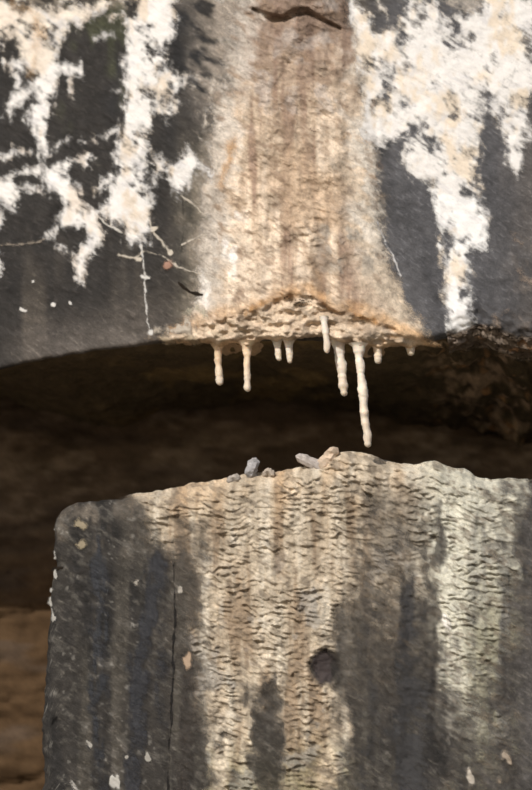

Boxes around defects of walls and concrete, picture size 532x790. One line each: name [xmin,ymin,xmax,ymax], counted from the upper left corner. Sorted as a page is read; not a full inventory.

water stain [0,0,532,358]
spalling [447,325,532,361]
crack [168,558,177,747]
water stain [123,451,531,790]